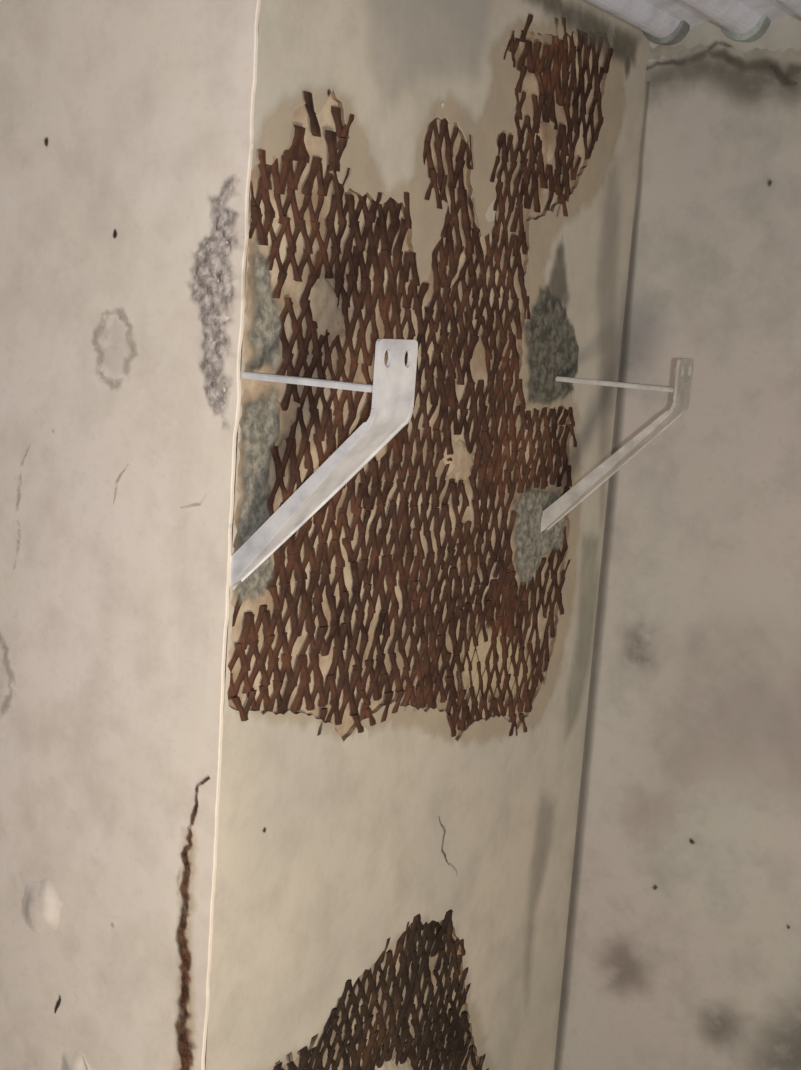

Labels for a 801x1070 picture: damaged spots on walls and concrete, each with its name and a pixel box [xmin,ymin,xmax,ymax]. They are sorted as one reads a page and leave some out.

flaking render [192,14,614,738]
flaking render [273,909,489,1070]